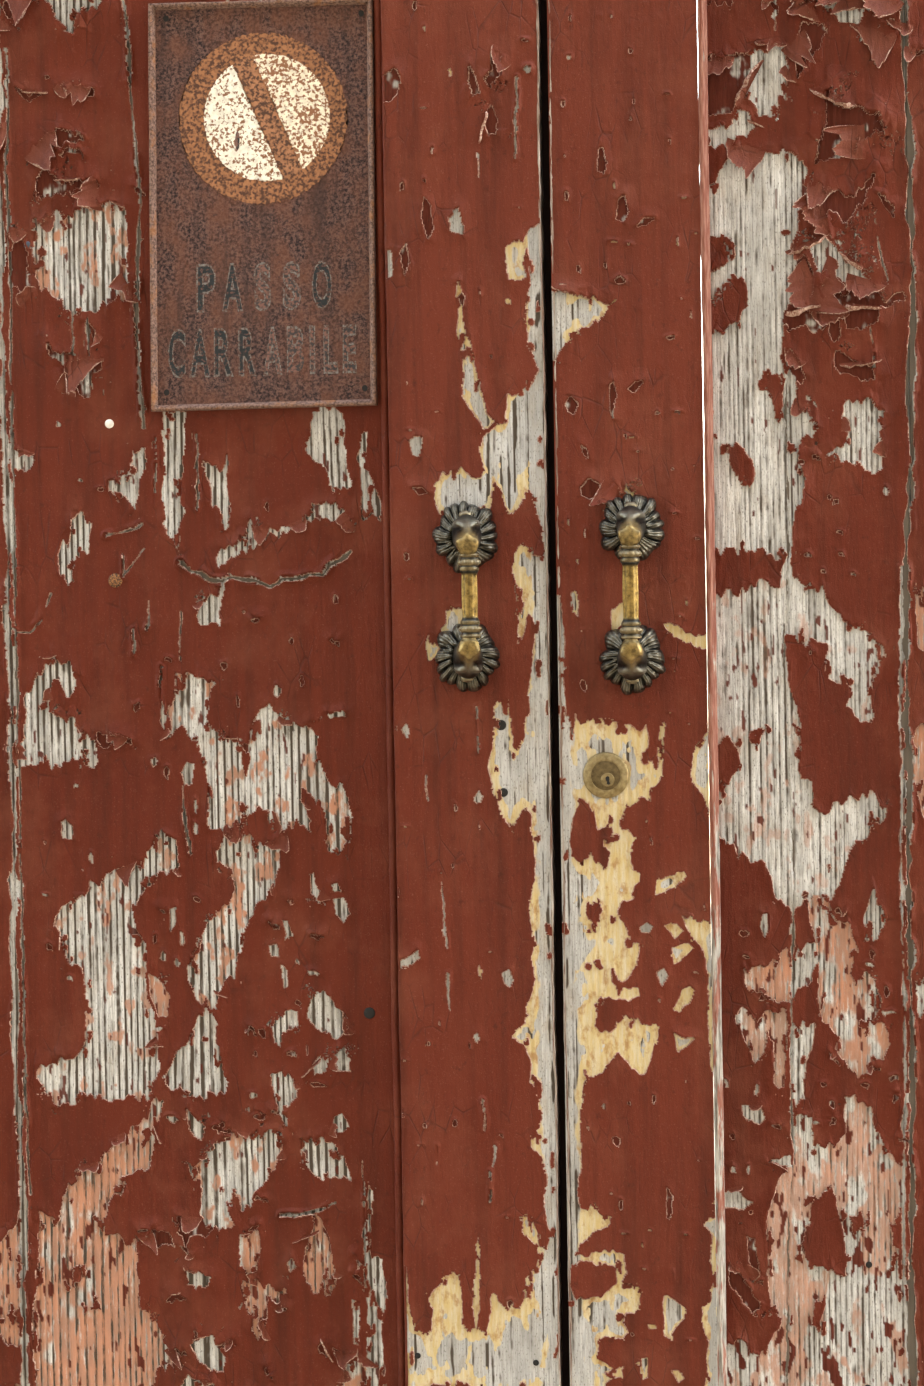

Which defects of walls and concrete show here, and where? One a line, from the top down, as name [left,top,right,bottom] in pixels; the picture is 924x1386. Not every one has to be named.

peeling [0,0,149,427]
peeling [383,59,428,108]
peeling [386,178,473,285]
peeling [0,218,628,1386]
peeling [557,0,924,1386]